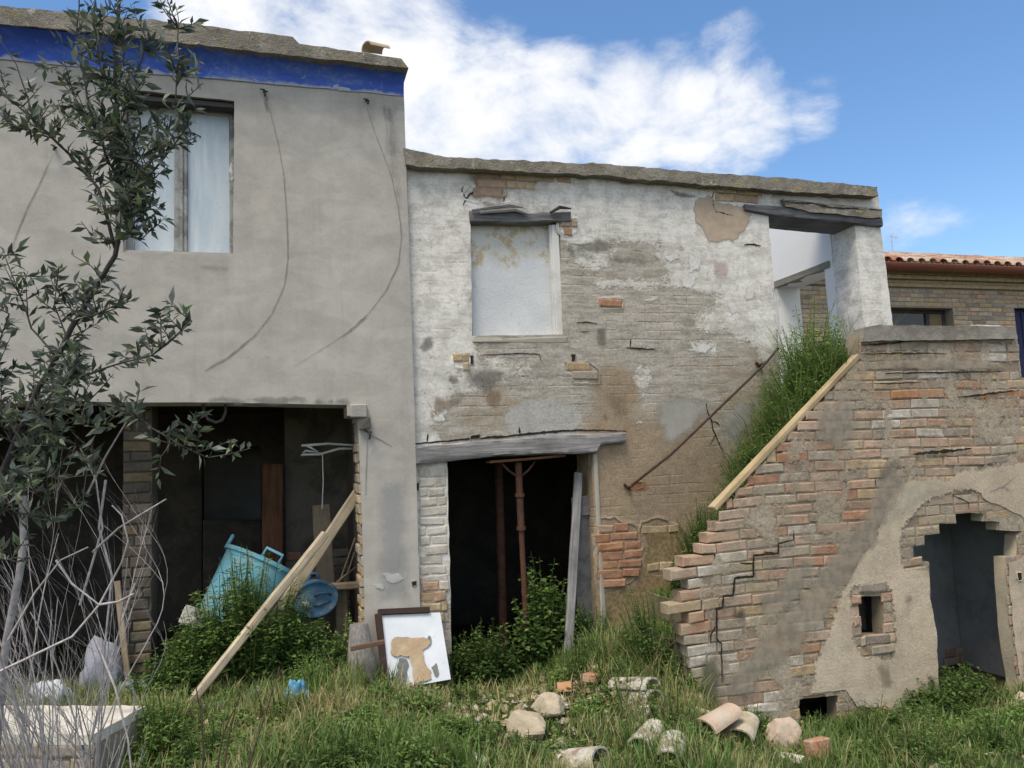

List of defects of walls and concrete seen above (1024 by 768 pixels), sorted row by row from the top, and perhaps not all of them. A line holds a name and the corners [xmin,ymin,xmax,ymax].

crack [205,97,289,371]
crack [295,107,402,366]
spalling [460,173,573,205]
spalling [694,189,764,242]
spalling [591,514,687,593]
crack [710,530,794,679]